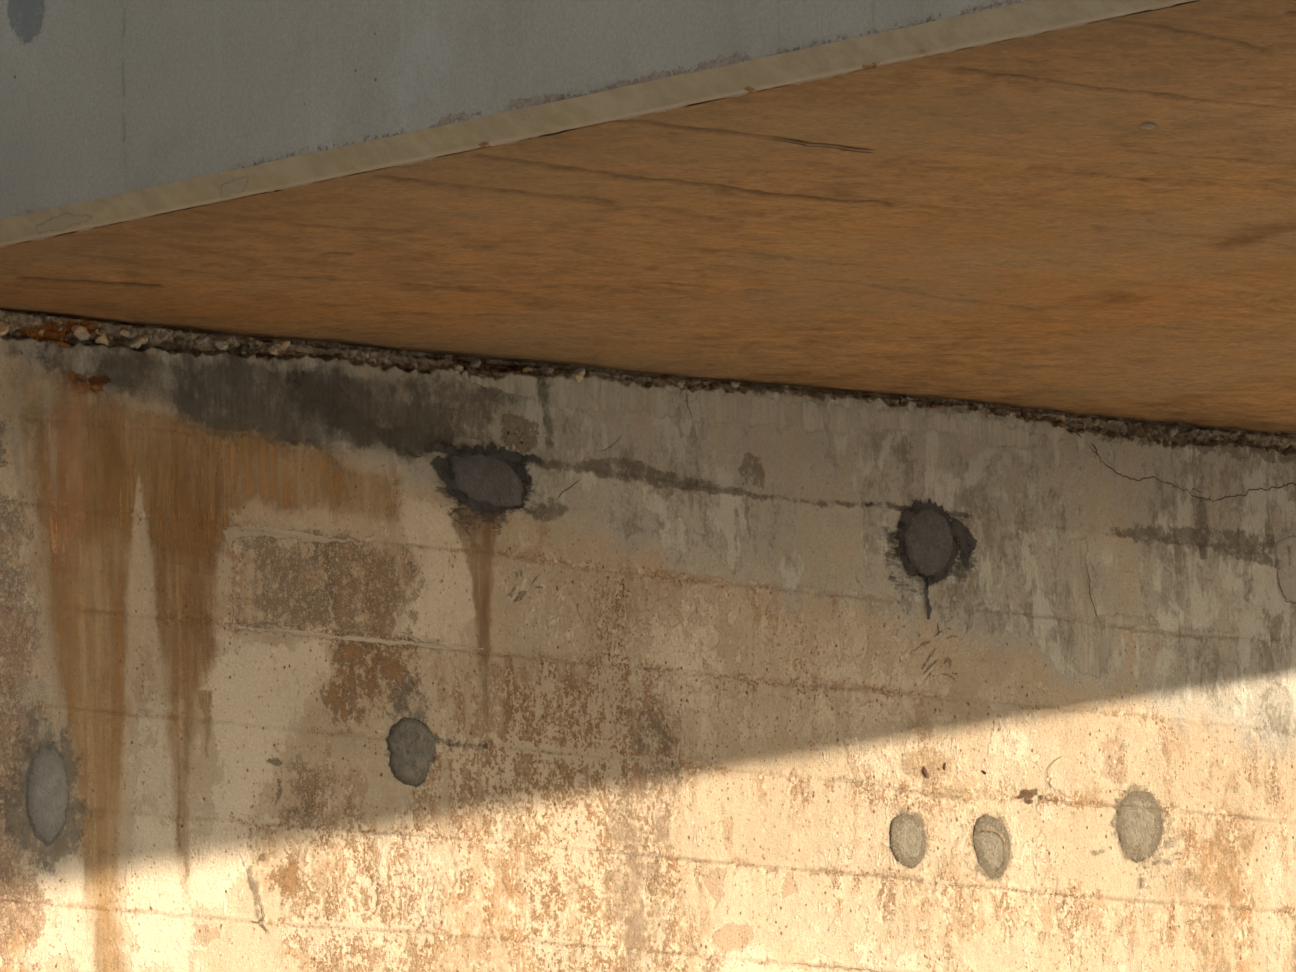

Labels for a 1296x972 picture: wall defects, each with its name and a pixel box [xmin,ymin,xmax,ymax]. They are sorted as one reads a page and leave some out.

corrosion [17,320,103,348]
spalling [0,310,1296,464]
crack [1067,429,1296,502]
corrosion [454,509,495,657]
corrosion [42,372,395,972]